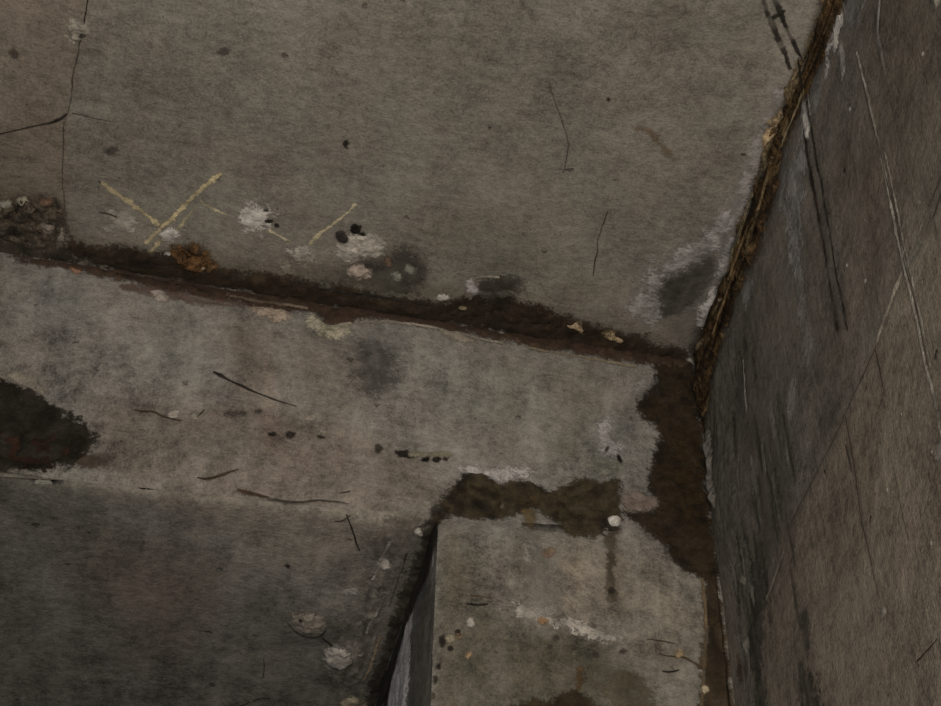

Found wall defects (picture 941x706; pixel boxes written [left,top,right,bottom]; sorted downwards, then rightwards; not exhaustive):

crack [0,113,111,216]
crack [765,3,848,332]
spalling [0,194,67,249]
damp [98,210,141,236]
damp [159,227,180,241]
rust [164,242,219,273]
damp [236,201,279,238]
damp [625,0,867,434]
damp [0,235,735,706]